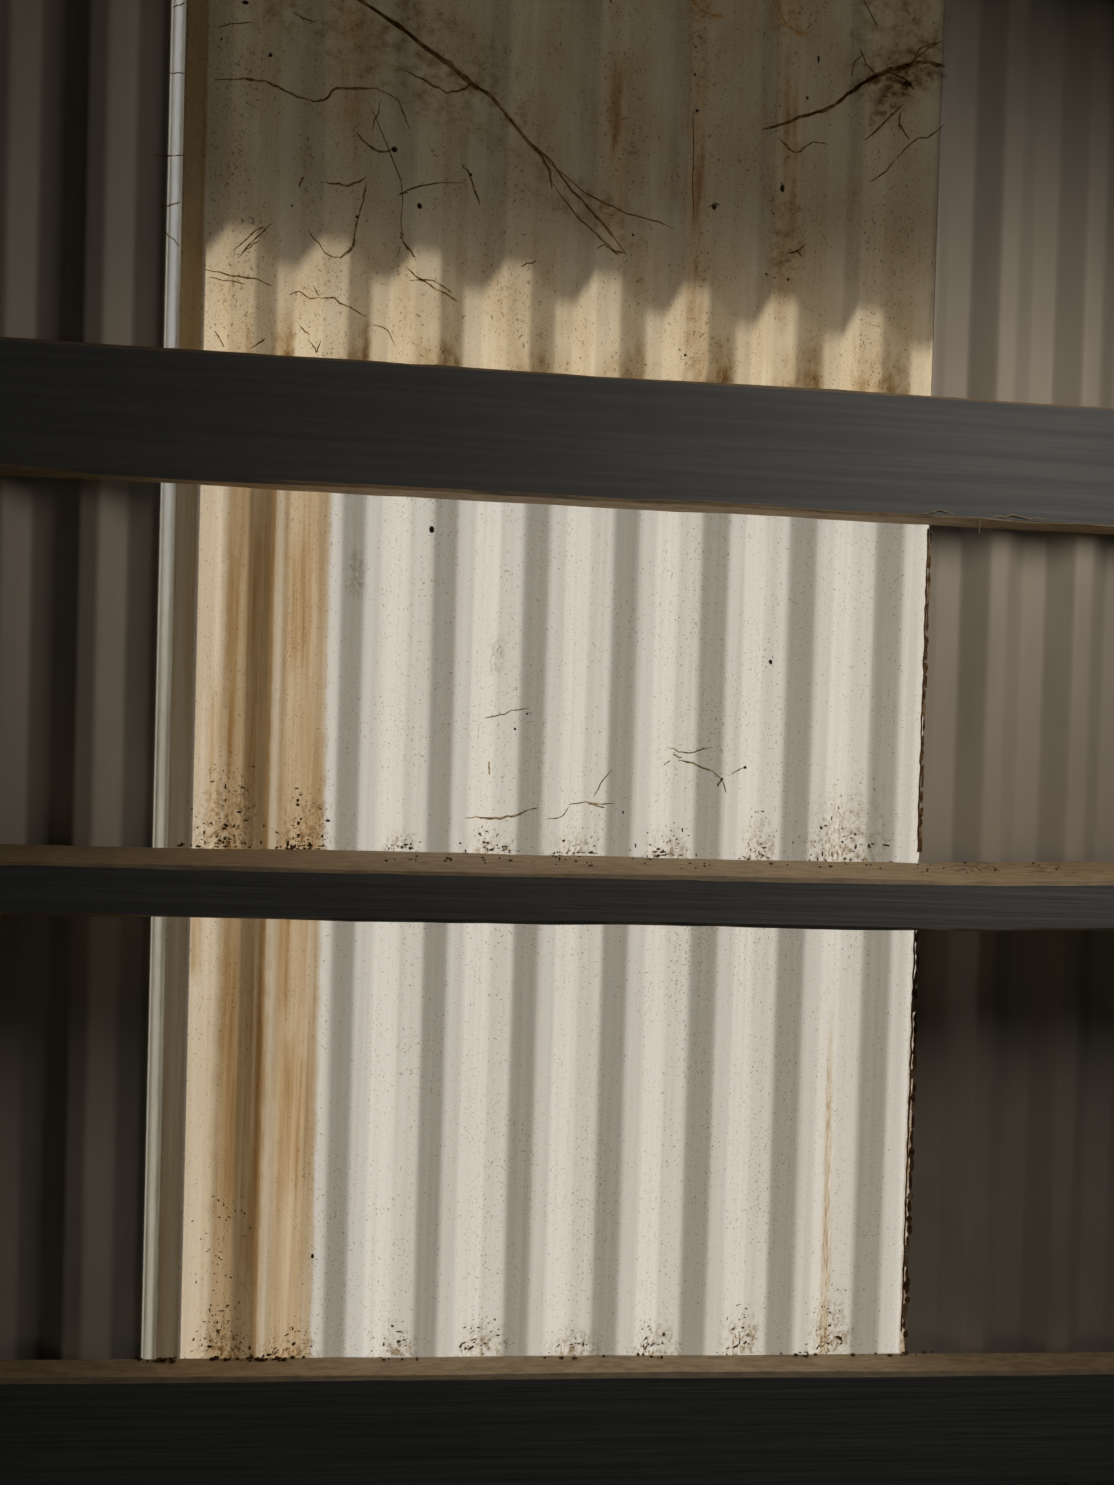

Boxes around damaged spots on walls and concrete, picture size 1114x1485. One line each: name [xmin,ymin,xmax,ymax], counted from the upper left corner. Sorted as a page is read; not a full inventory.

leakage [191,918,261,1343]